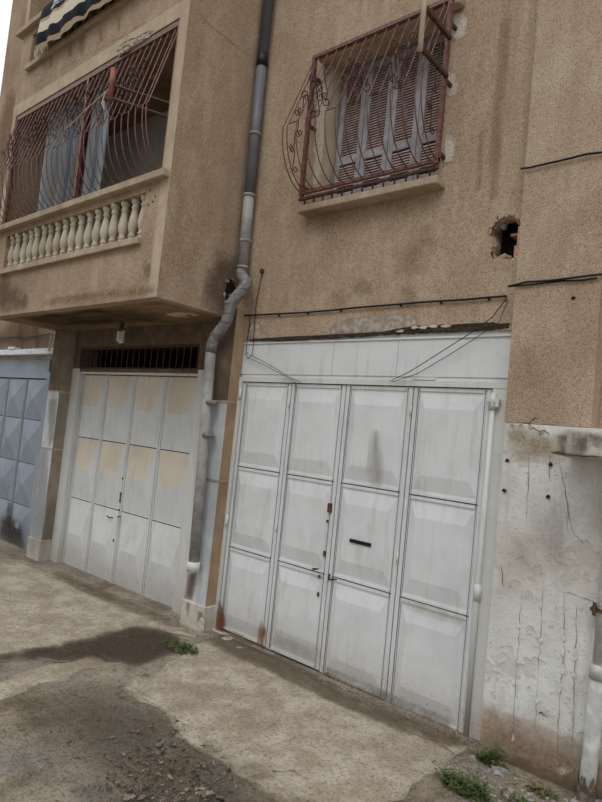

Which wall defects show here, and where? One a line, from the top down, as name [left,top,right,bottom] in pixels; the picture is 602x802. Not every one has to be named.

spalling [486,202,522,273]
crack [507,418,549,437]
crack [549,452,599,544]
rust [216,604,224,629]
crack [511,591,523,741]
crack [535,580,594,766]